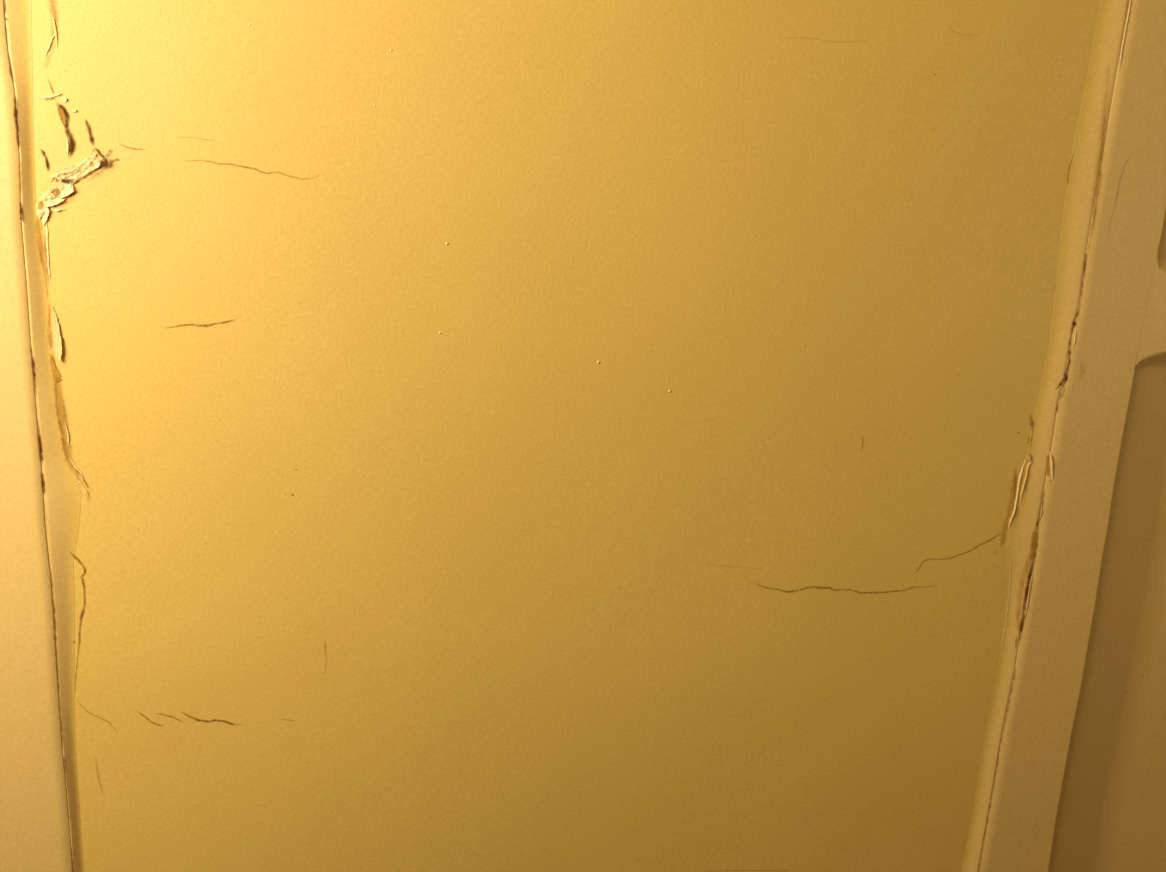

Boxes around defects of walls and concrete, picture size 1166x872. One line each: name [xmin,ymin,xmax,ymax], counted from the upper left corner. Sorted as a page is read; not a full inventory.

spalling [36,149,118,225]
crack [1031,255,1086,425]
peeling [1008,451,1054,531]
crack [141,714,232,724]